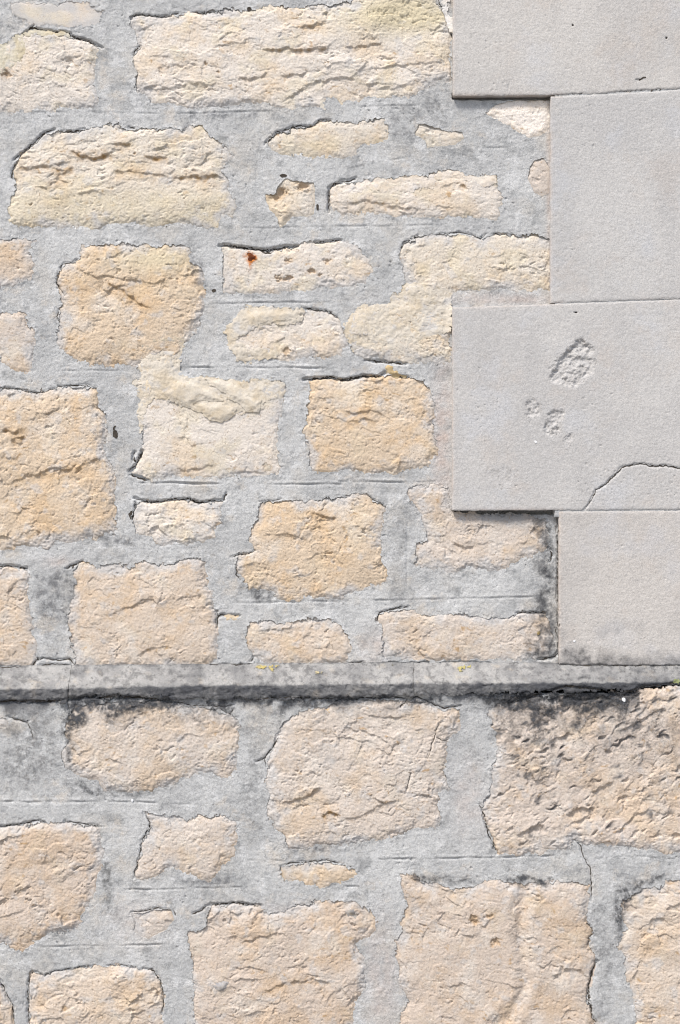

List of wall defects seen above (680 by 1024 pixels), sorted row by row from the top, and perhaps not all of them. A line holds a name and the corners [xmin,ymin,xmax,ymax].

spalling [548,337,597,389]
spalling [524,397,574,449]
crack [586,463,680,507]